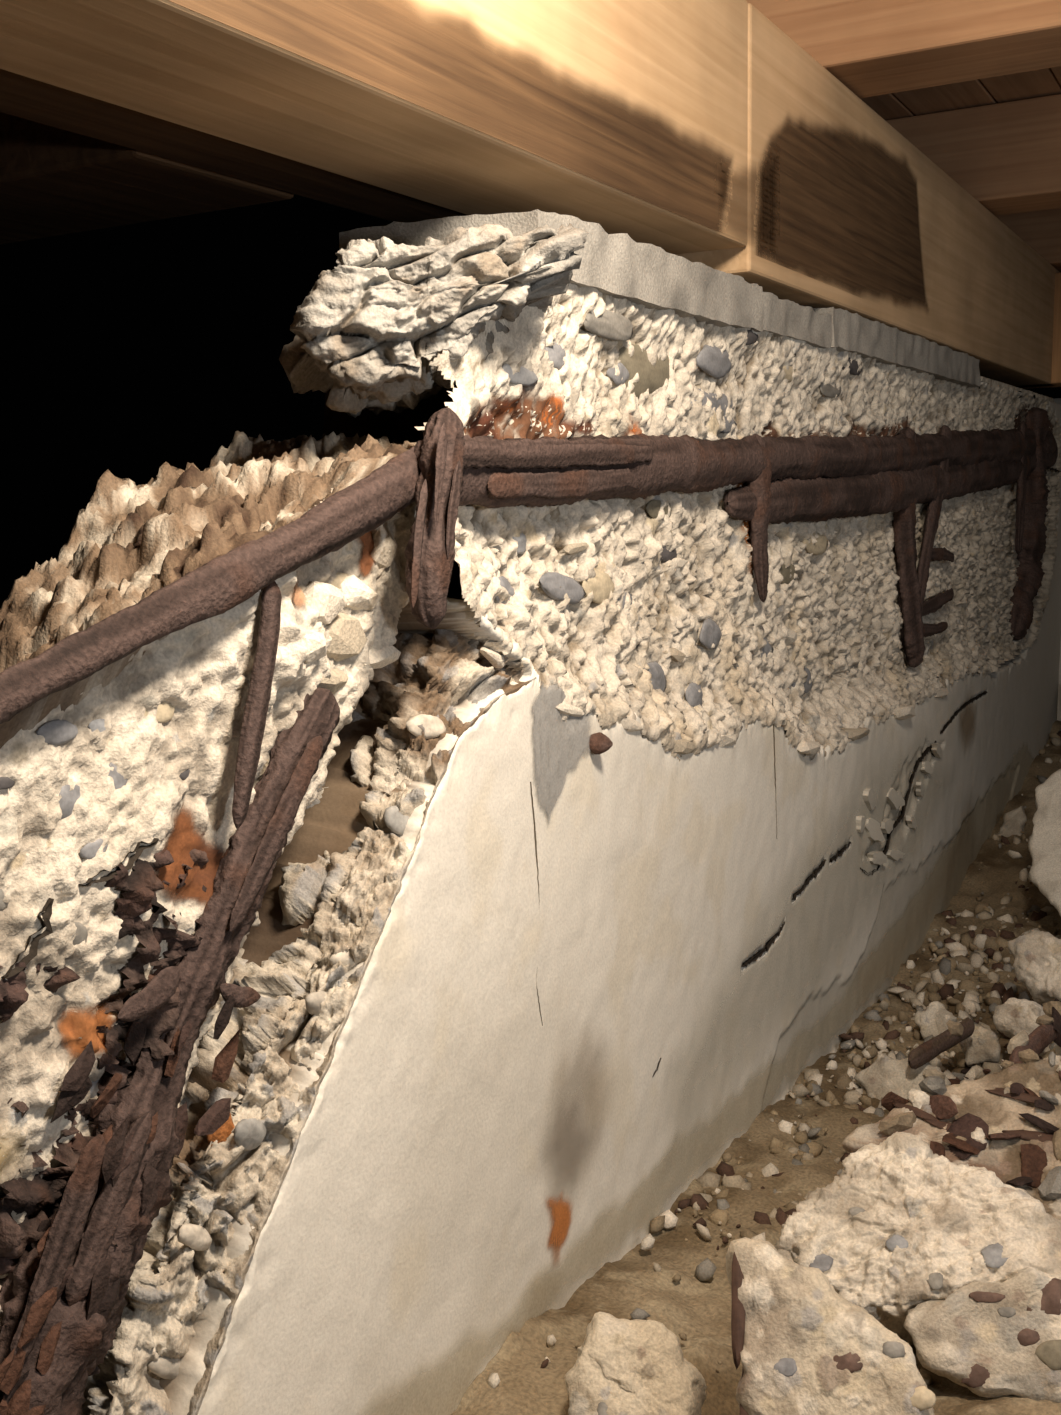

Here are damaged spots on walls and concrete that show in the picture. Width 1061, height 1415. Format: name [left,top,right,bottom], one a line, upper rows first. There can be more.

damp [169,0,731,232]
damp [757,120,927,307]
rust [464,386,594,440]
spalling [279,223,1061,641]
crack [1,838,159,979]
rust [156,808,226,903]
spalling [0,410,1061,1415]
crack [741,691,987,967]
rust [50,1009,159,1216]
rust [194,995,240,1147]
damp [372,748,1034,1415]
rust [548,1198,571,1248]